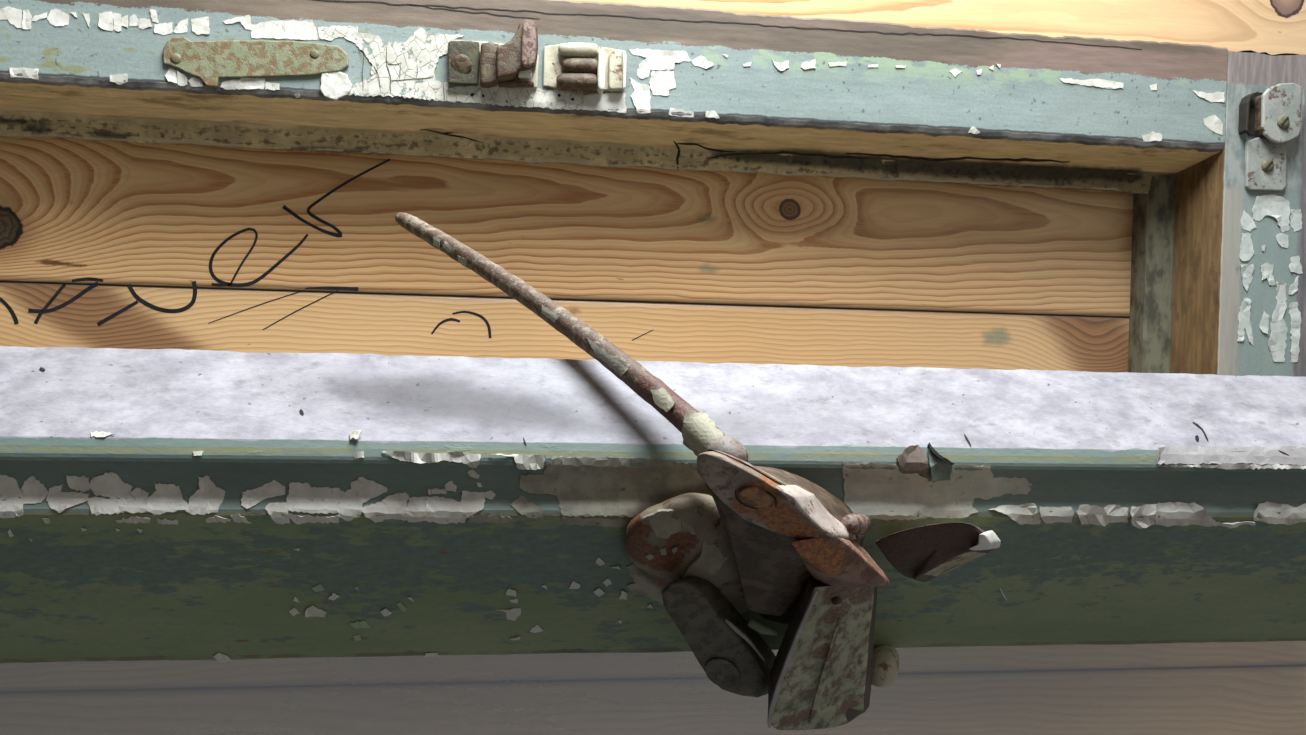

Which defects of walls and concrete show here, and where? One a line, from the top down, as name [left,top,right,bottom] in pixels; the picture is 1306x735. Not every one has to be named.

peeling [0,6,728,118]
peeling [772,59,847,71]
peeling [949,64,1001,77]
peeling [1059,78,1124,89]
peeling [1192,90,1225,135]
crack [673,141,750,171]
crack [781,151,1070,163]
peeling [1142,132,1162,142]
peeling [1237,194,1303,362]
peeling [0,388,732,608]
rust [627,486,712,527]
peeling [842,462,1306,529]